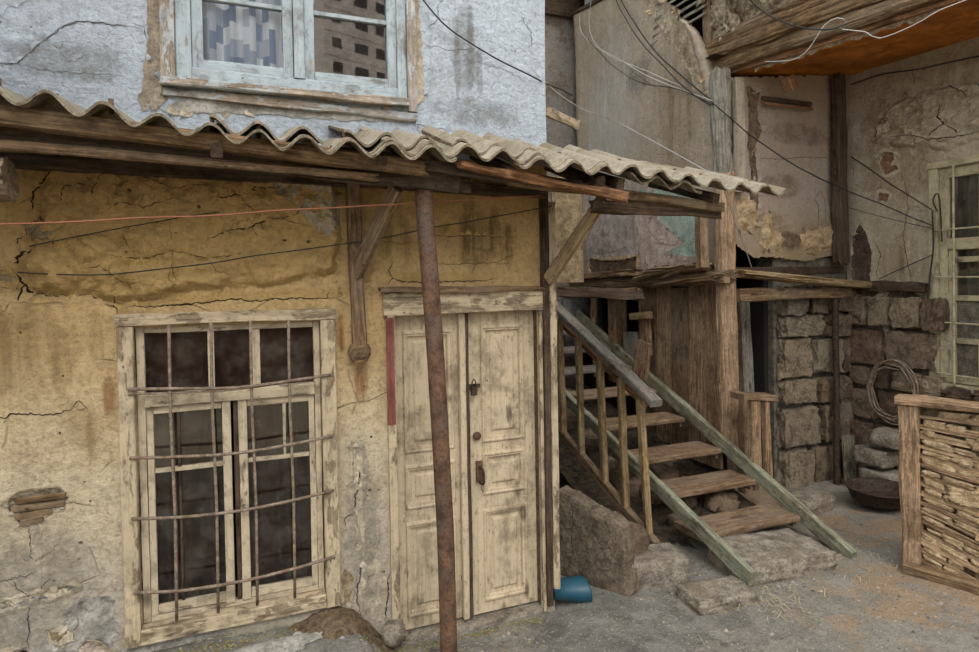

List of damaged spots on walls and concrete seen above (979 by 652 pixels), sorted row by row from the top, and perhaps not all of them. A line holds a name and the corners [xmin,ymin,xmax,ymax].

crack [0,10,148,77]
flaking render [582,195,610,216]
flaking render [623,183,693,199]
crack [14,155,343,314]
flaking render [586,214,696,278]
spalling [800,224,833,256]
crack [0,400,87,423]
flaking render [0,579,119,652]
crack [118,628,230,652]